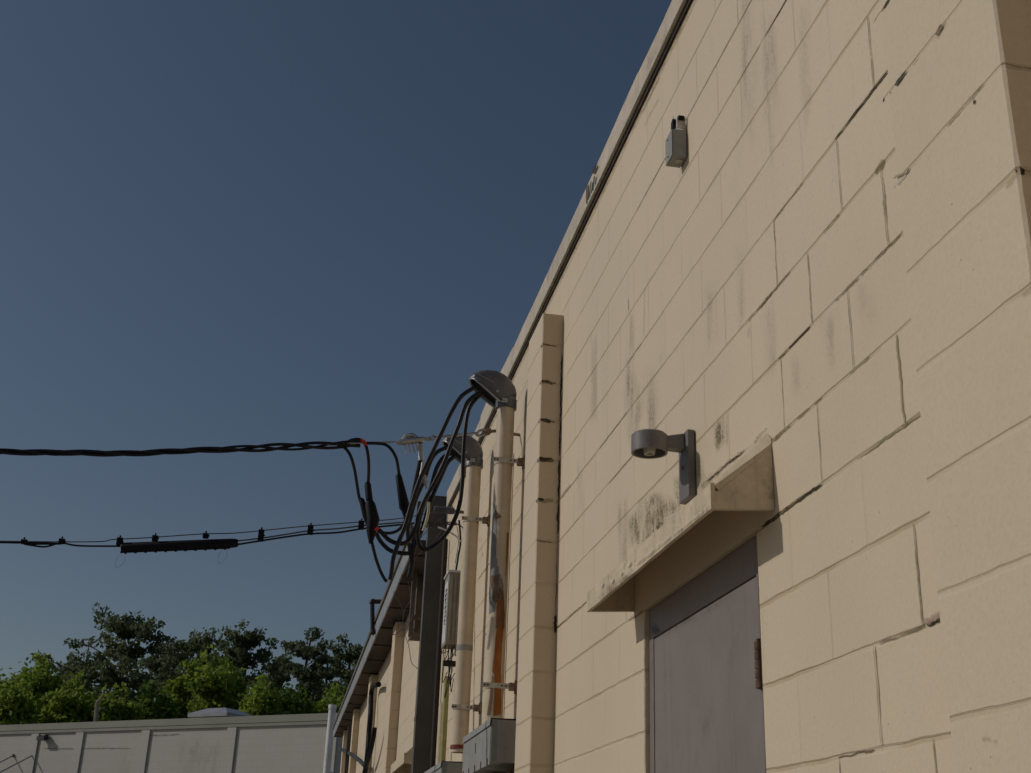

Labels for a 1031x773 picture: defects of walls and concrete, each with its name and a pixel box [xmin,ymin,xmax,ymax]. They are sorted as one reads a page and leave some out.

crack [823,18,888,233]
crack [554,357,587,633]
crack [747,160,909,527]
crack [856,335,921,459]
crack [838,523,925,772]